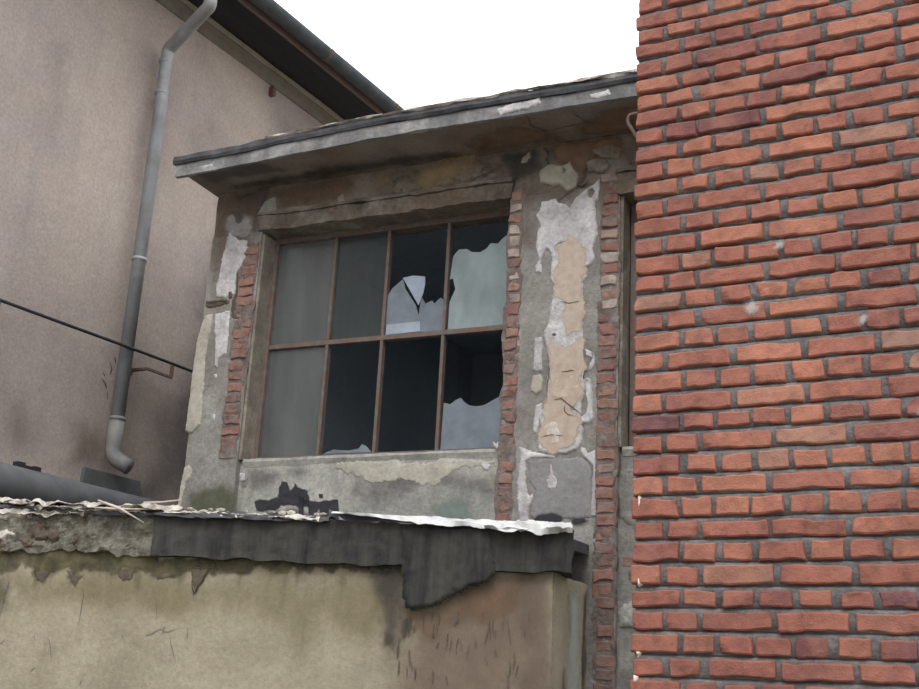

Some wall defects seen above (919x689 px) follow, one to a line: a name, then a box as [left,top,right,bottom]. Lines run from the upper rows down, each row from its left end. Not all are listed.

spalling [185,197,277,459]
peeling [335,145,636,689]
spalling [0,507,79,553]
peeling [177,466,192,511]
leakage [0,549,410,644]